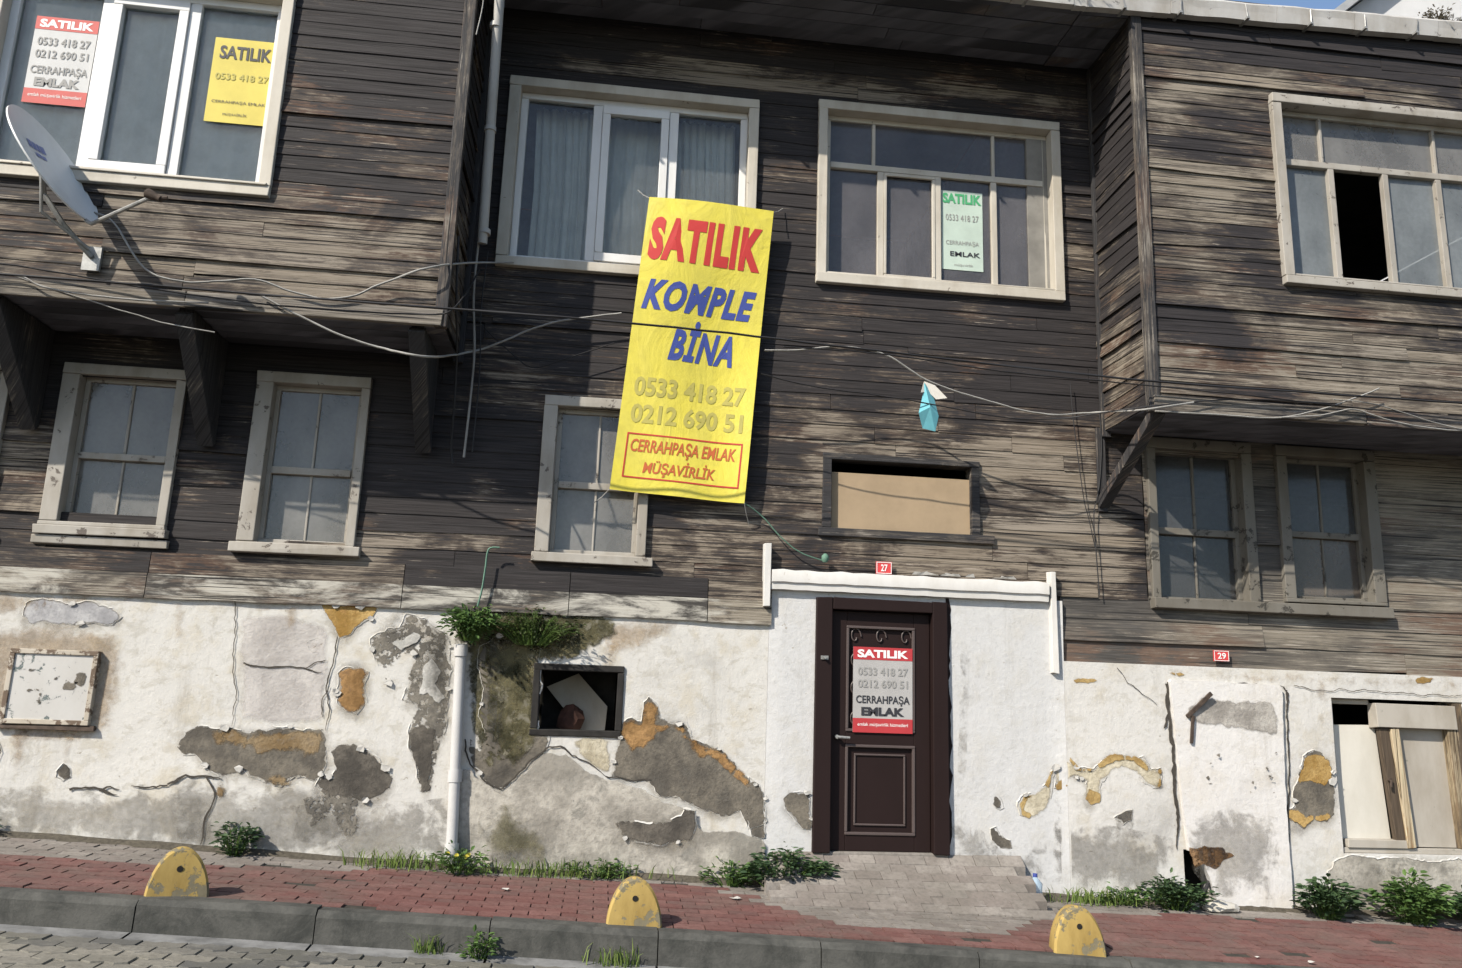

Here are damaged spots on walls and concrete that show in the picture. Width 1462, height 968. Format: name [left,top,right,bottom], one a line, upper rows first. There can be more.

peeling [22,598,123,627]
crack [232,603,338,729]
peeling [321,605,454,792]
water stain [453,611,615,766]
crack [69,774,222,845]
flaking render [178,724,393,836]
flaking render [575,696,812,847]
peeling [989,754,1163,849]
crack [1117,668,1180,849]
peeling [1252,749,1337,829]
flaking render [1183,846,1234,899]